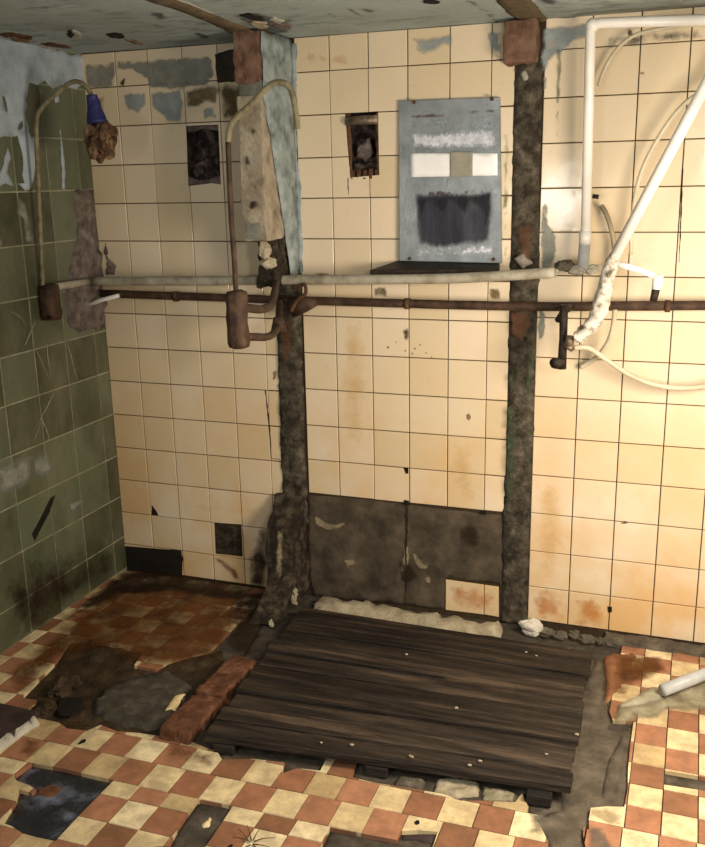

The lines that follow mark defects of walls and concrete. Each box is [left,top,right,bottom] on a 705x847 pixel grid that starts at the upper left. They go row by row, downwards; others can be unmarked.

peeling [0,30,217,191]
peeling [18,202,32,241]
peeling [214,522,243,556]
leakage [15,535,267,683]
peeling [4,767,111,841]
peeling [323,820,434,847]